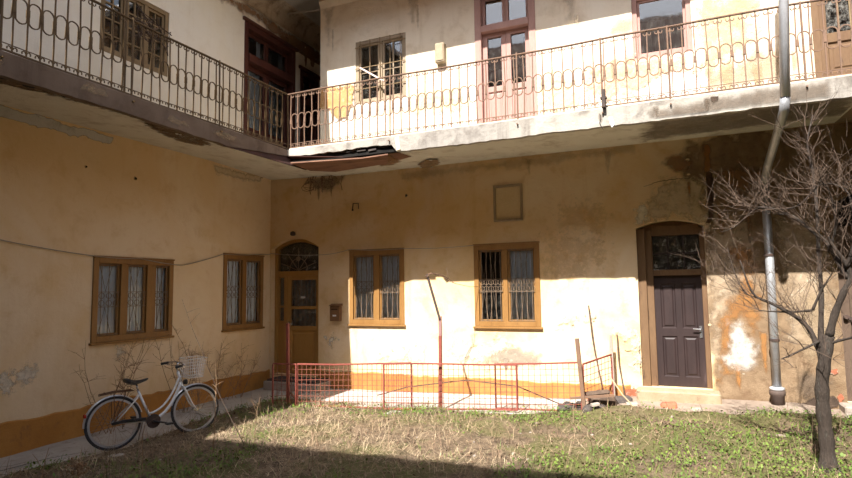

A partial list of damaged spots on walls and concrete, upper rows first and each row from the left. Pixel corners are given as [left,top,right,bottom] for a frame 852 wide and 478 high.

leakage [717,166,762,197]
flaking render [682,122,852,418]